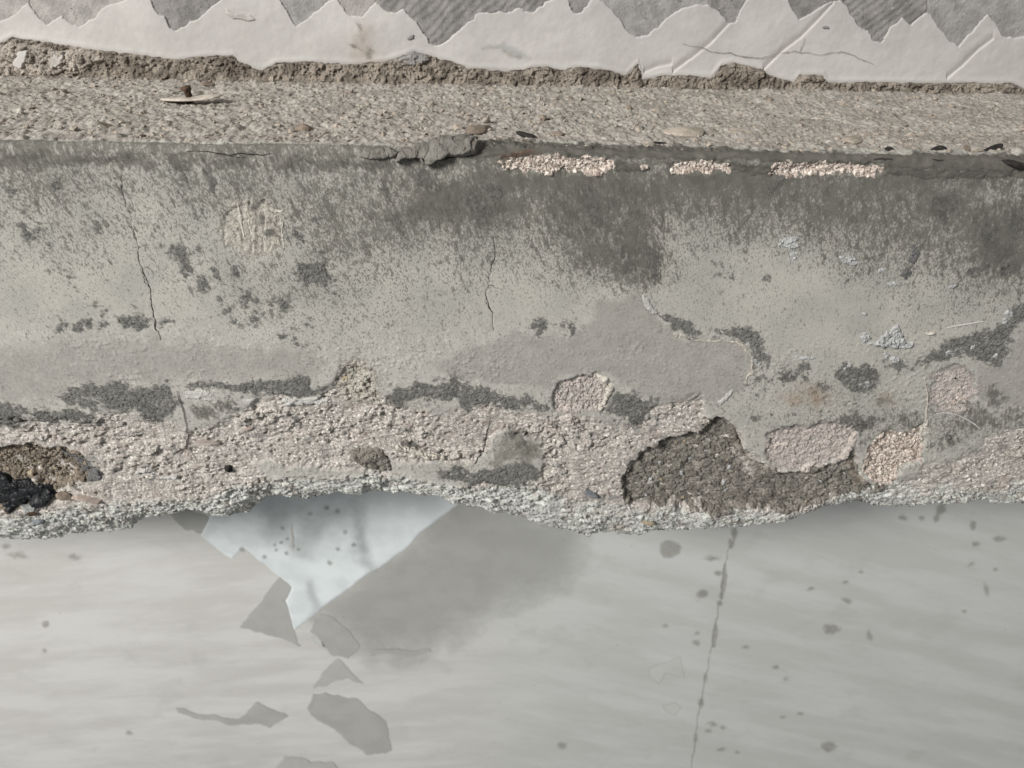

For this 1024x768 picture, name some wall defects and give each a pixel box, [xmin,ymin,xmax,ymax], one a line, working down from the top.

peeling [0,0,124,27]
peeling [151,0,256,30]
peeling [281,0,549,66]
peeling [569,0,746,37]
peeling [789,0,1024,46]
spalling [0,39,106,77]
damp [475,138,1024,286]
crack [121,157,161,340]
crack [485,238,495,329]
spalling [620,331,928,517]
spalling [0,442,103,491]
spalling [349,446,392,472]